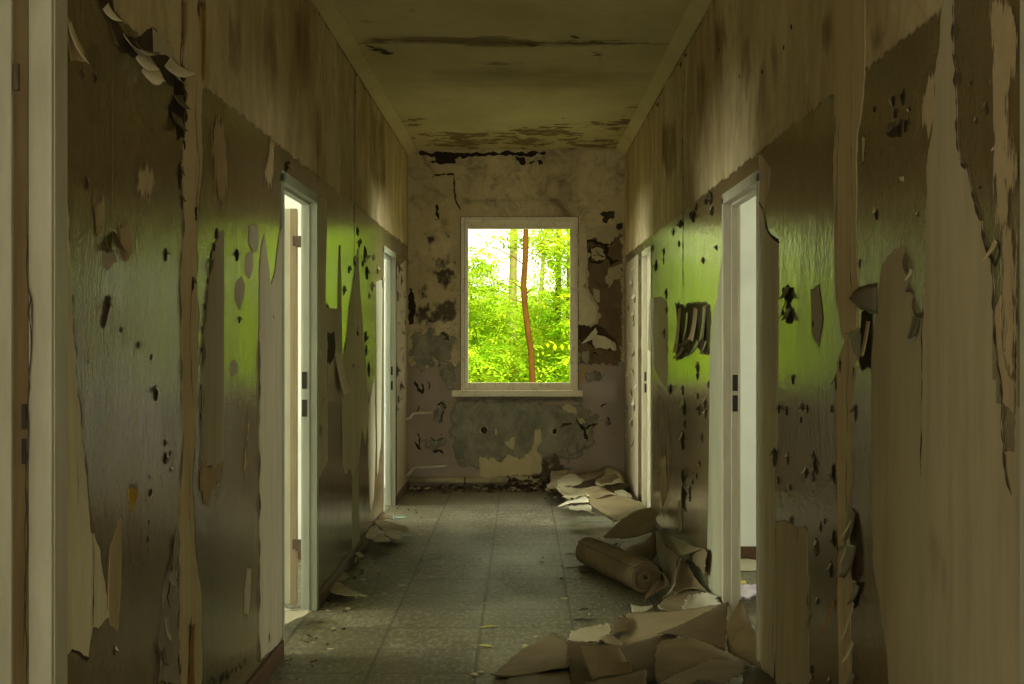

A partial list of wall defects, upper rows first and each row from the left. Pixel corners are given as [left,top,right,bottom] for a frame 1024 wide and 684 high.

peeling [98,0,252,684]
peeling [235,225,259,323]
peeling [318,197,354,481]
flaking render [343,227,456,493]
water stain [401,37,609,46]
flaking render [401,118,631,165]
flaking render [434,397,609,486]
flaking render [578,209,665,497]
peeling [662,245,722,604]
peeling [775,285,793,324]
peeling [800,0,878,684]
peeling [974,0,1018,413]